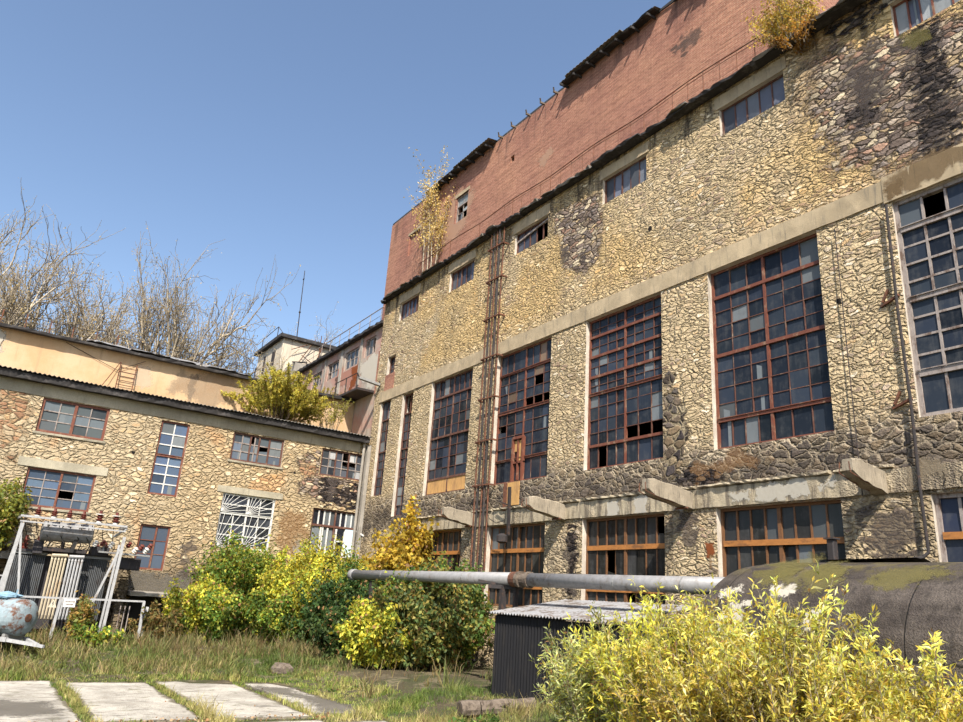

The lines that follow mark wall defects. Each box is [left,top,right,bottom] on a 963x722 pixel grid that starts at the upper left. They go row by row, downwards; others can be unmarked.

leakage [671,27,702,57]
leakage [823,0,963,200]
spalling [553,193,603,276]
spalling [293,451,362,506]